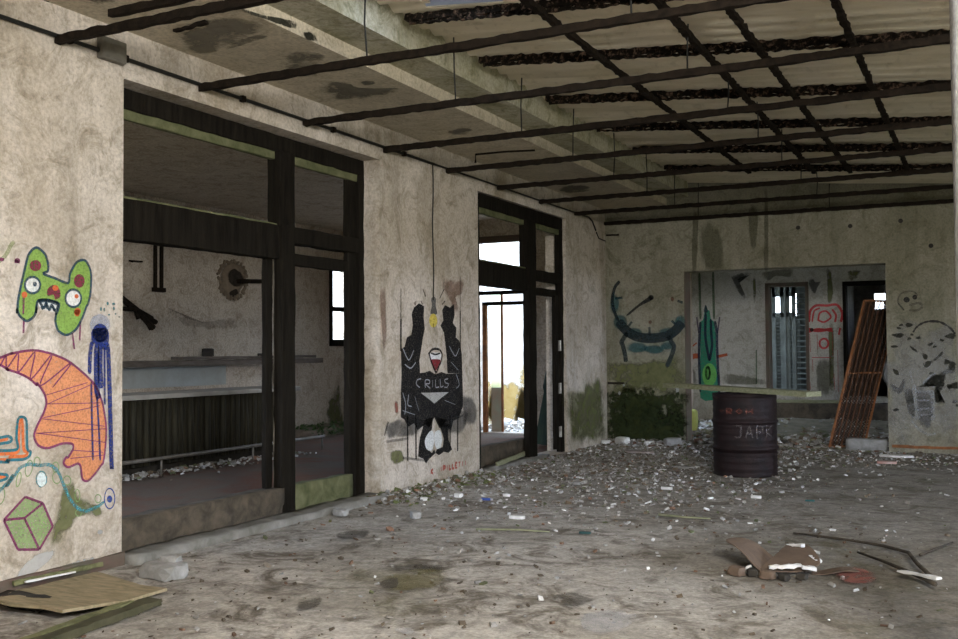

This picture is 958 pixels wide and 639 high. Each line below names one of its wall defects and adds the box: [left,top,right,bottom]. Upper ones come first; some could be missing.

spalling [173,19,209,33]
damp [184,9,317,53]
spalling [474,149,535,163]
damp [609,359,684,395]